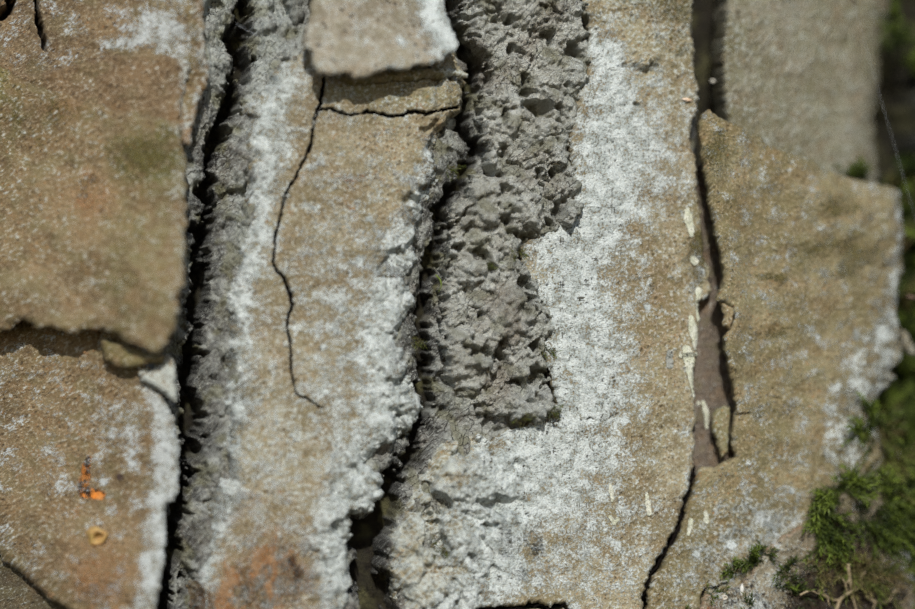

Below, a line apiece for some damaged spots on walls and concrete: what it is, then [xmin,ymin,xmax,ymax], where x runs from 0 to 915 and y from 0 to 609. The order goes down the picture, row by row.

crack [0,0,45,50]
crack [689,118,697,158]
crack [146,0,311,609]
crack [271,0,530,609]
crack [485,601,567,609]
crack [642,465,696,609]